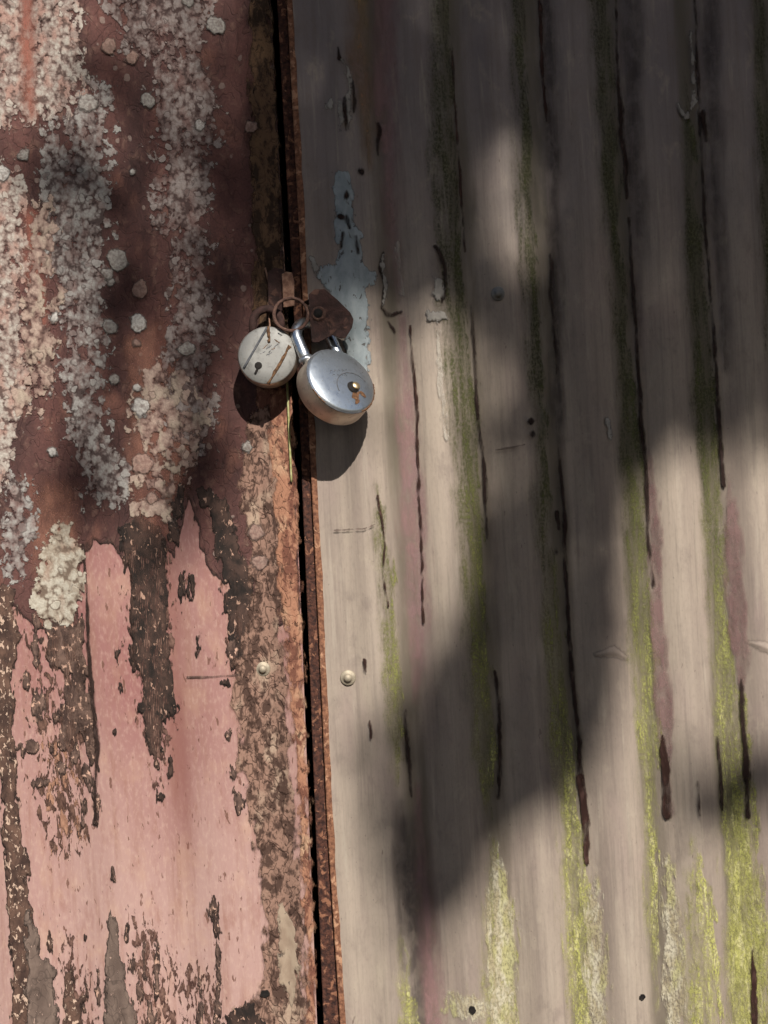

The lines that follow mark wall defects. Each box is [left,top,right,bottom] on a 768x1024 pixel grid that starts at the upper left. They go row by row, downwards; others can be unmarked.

peeling [309,170,377,372]
corrosion [0,0,317,1024]
crack [334,494,389,607]
crack [378,252,425,623]
peeling [0,405,311,1024]
crack [404,710,412,797]
crack [555,459,590,865]
crack [660,735,671,820]
crack [697,679,751,819]
crack [750,950,758,1024]